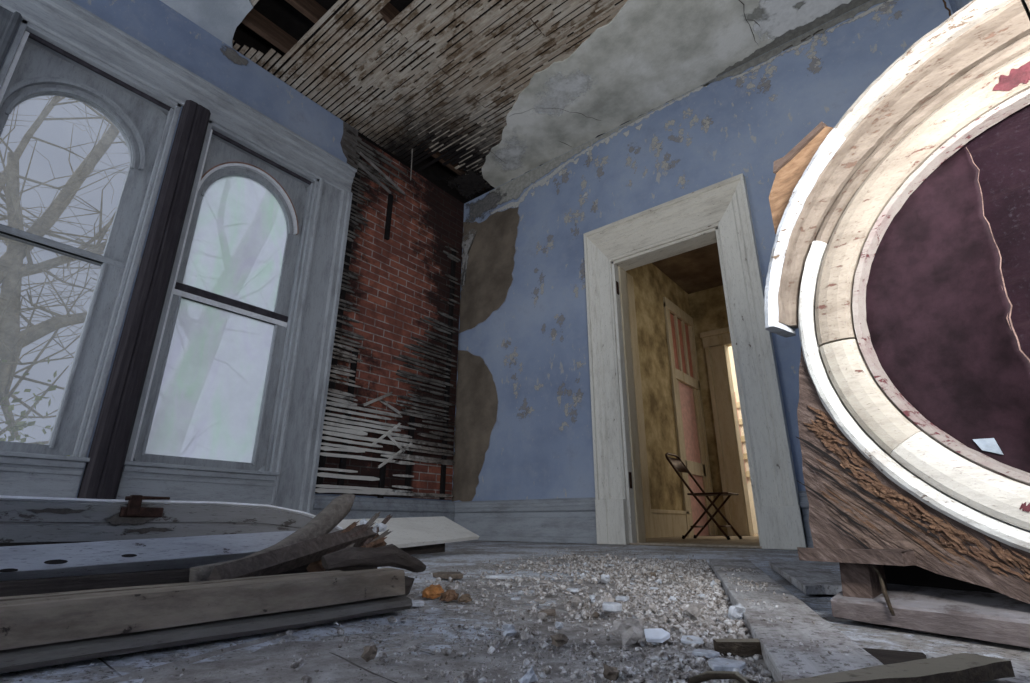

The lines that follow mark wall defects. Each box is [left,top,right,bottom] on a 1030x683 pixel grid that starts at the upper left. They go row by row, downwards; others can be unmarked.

flaking render [232,0,902,502]
crack [739,0,761,42]